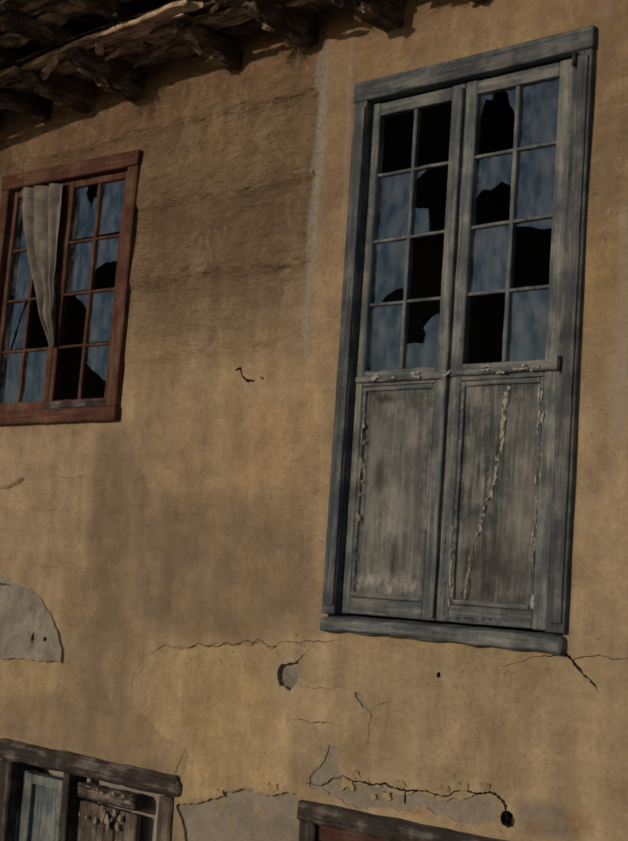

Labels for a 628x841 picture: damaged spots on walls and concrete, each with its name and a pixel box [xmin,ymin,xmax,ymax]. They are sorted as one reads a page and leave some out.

flaking render [0,575,64,663]
crack [142,639,333,661]
crack [503,654,626,693]
peeling [131,642,515,841]
crack [306,770,510,819]